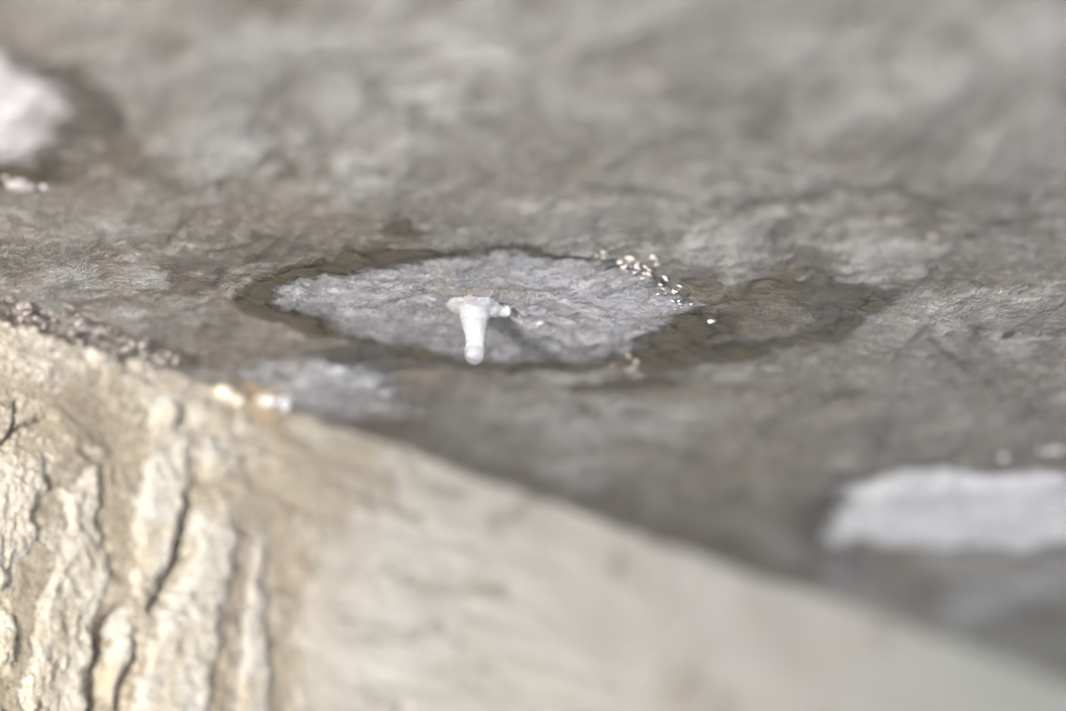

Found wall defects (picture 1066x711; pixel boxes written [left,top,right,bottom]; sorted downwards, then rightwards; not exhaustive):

water stain [0,48,145,192]
crack [6,411,41,437]
water stain [0,364,150,711]
water stain [142,220,1066,711]